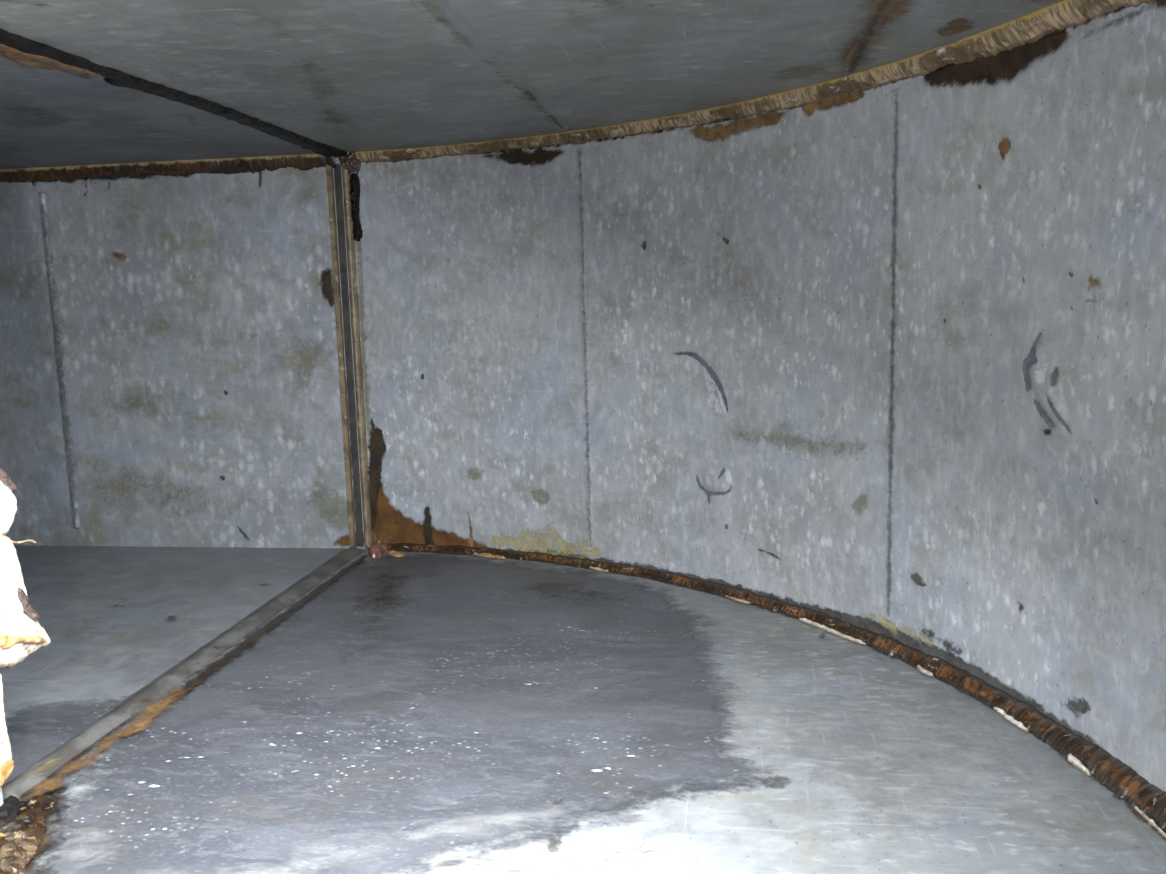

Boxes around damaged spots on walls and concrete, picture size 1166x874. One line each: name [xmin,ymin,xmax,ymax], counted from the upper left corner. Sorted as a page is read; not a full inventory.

corrosion [939,19,971,36]
corrosion [998,138,1010,159]
corrosion [34,420,488,794]
leakage [3,699,125,800]
leakage [27,529,761,874]